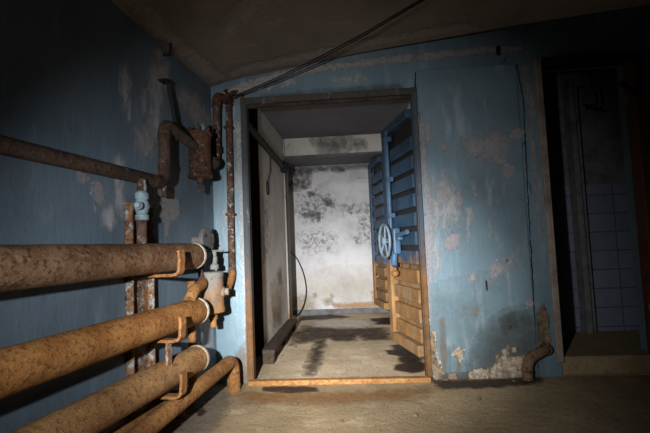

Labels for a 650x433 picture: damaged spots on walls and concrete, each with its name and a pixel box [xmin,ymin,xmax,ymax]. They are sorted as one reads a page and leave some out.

peeling [158,189,180,235]
water stain [288,165,367,222]
peeling [221,45,525,380]
water stain [290,314,425,375]